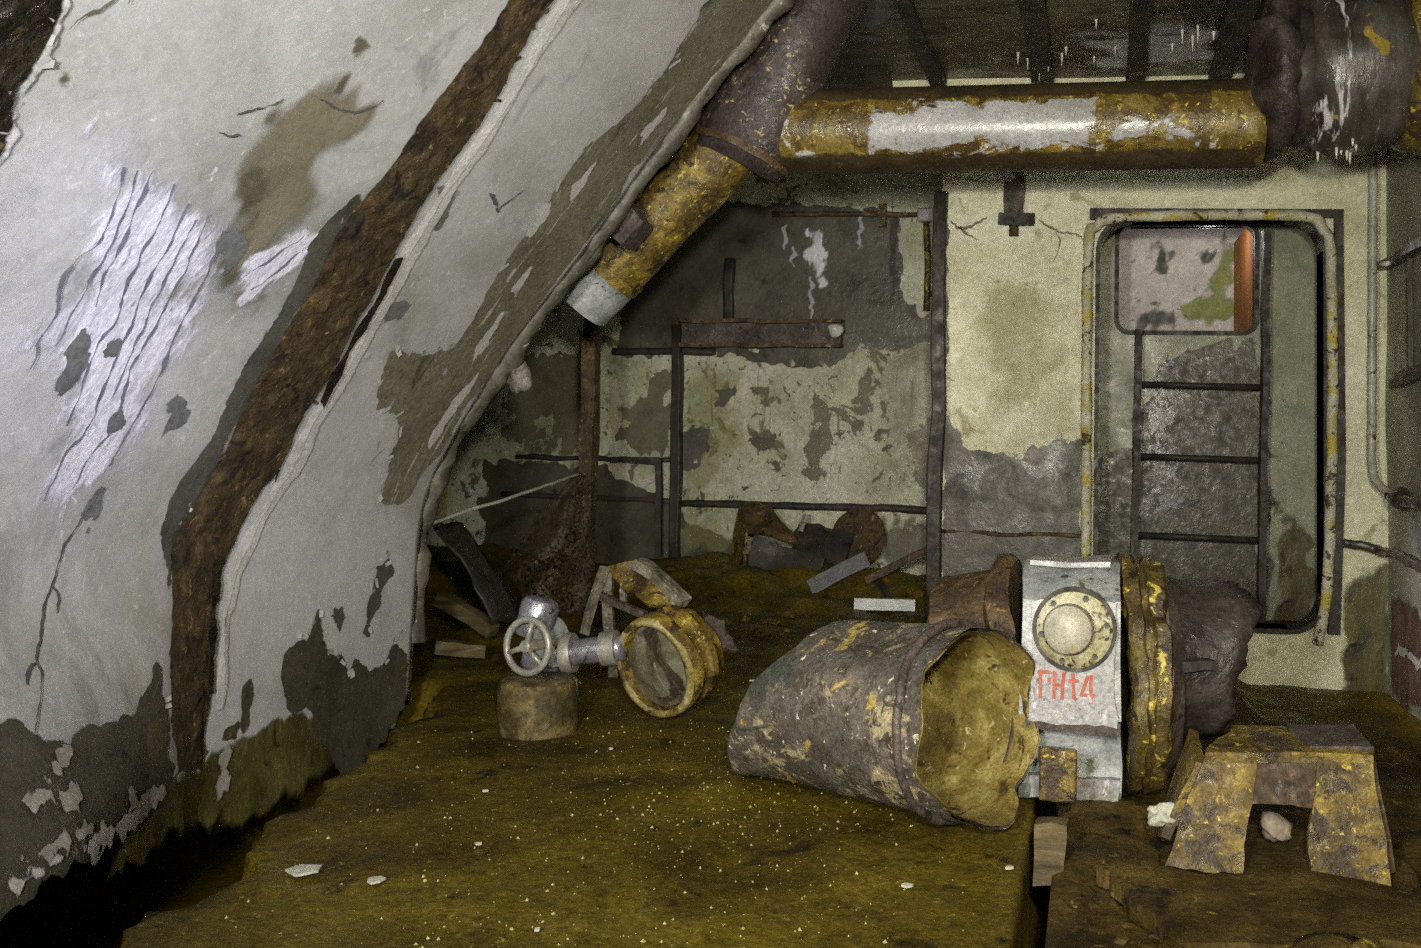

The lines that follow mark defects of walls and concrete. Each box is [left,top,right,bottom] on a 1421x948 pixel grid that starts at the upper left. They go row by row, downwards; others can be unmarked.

crack [70,0,130,29]
water stain [353,36,369,56]
water stain [24,74,384,533]
flaking render [160,194,361,589]
rust [313,257,403,407]
peeling [376,0,773,505]
rust [592,260,643,299]
peeling [615,201,950,481]
crack [25,497,98,733]
peeling [222,679,254,741]
peeling [281,606,408,774]
rust [1390,597,1421,712]